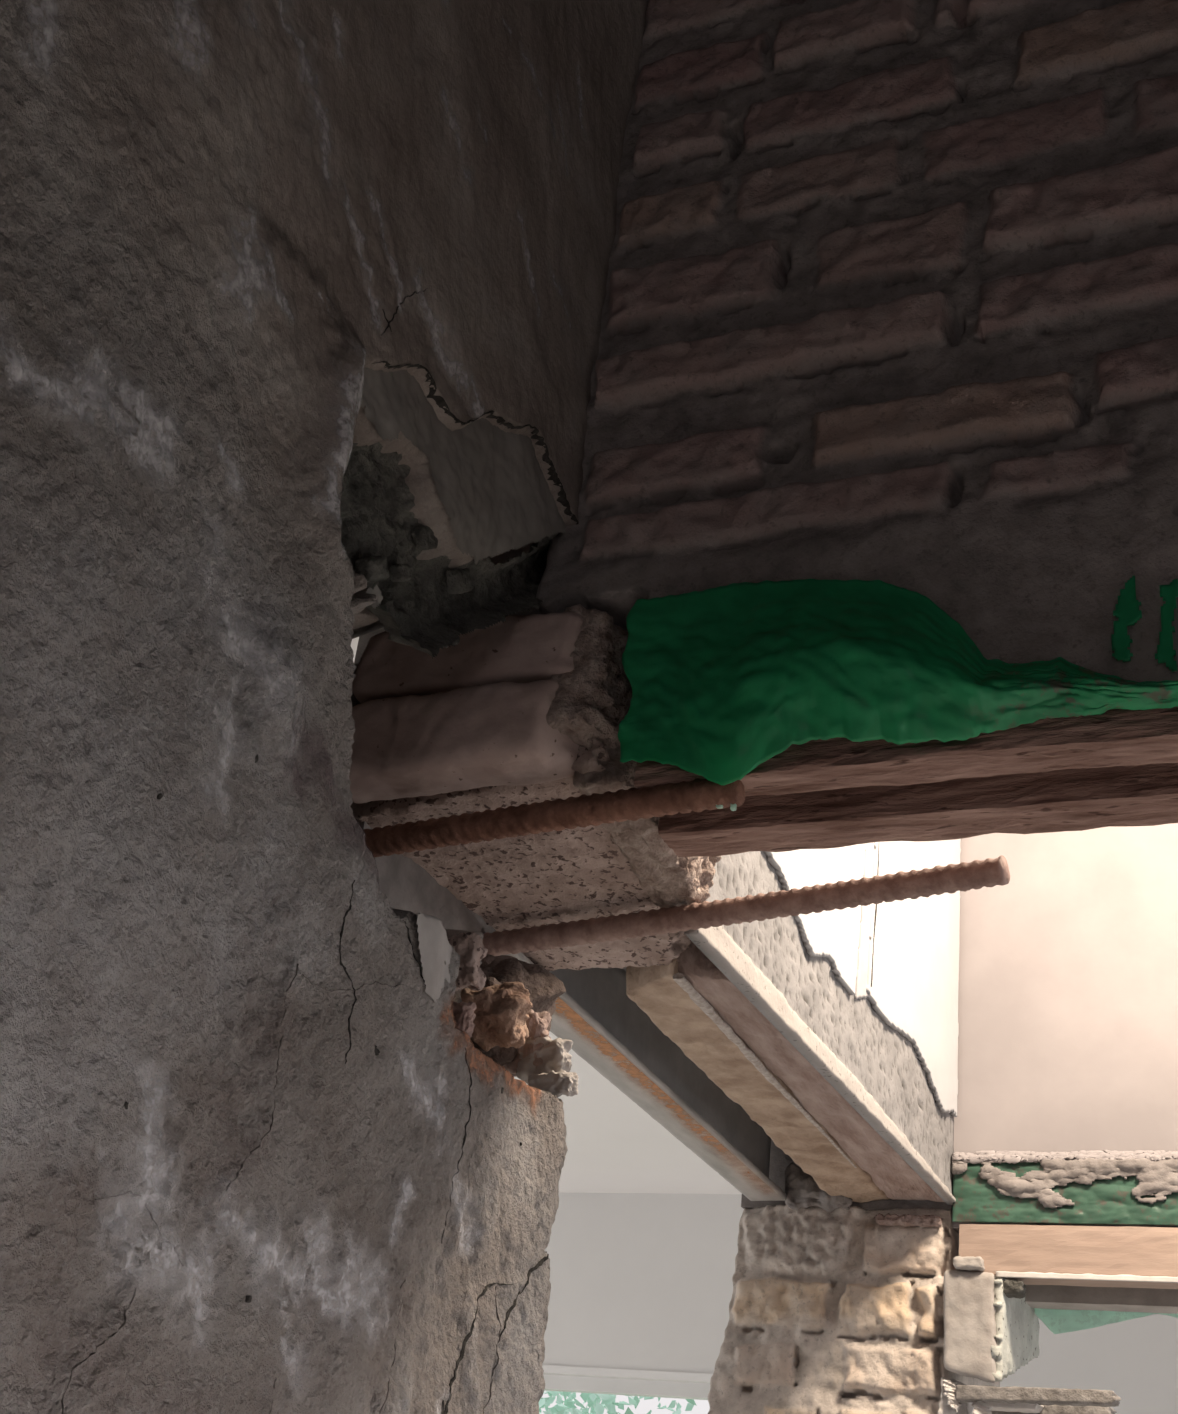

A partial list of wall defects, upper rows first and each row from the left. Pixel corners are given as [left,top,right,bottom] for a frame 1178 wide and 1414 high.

flaking render [340,361,579,659]
spalling [363,778,745,857]
rust [441,1005,541,1107]
peeling [482,839,1010,1117]
crack [379,1280,406,1414]
crack [441,1251,549,1414]